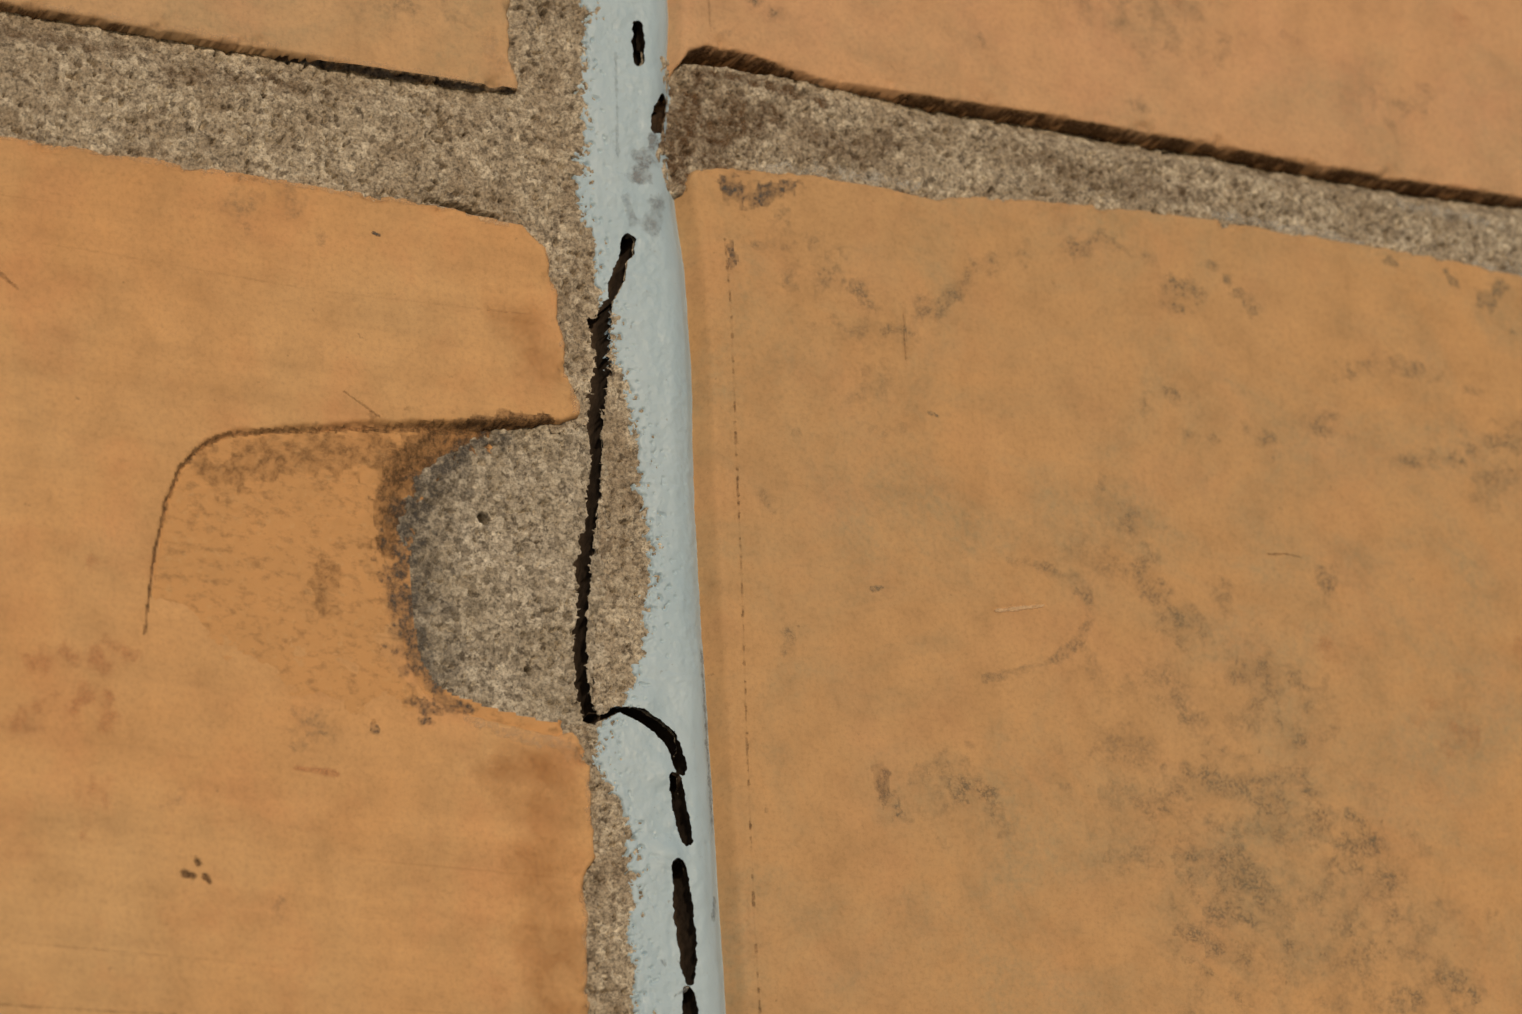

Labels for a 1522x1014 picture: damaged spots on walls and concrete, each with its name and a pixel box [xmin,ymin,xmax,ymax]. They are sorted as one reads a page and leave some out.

spalling [146,374,612,748]
crack [570,236,699,1014]